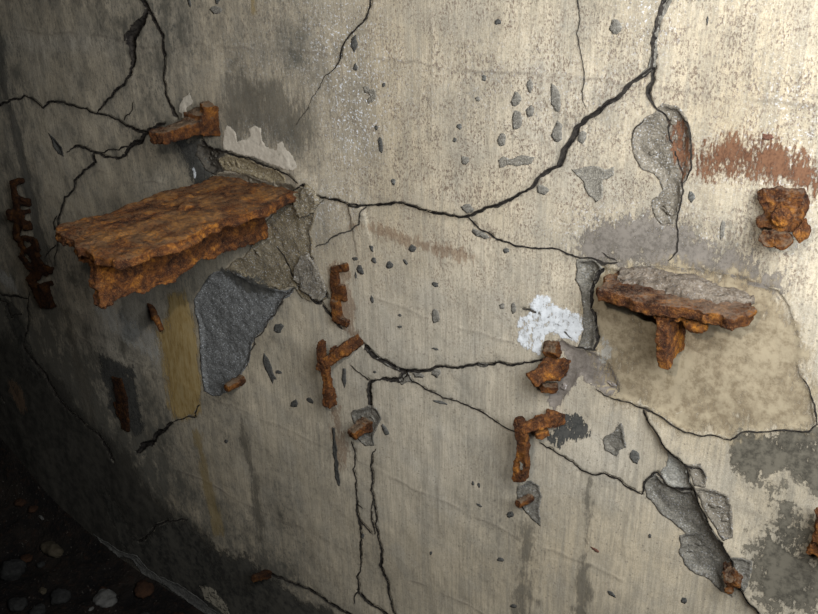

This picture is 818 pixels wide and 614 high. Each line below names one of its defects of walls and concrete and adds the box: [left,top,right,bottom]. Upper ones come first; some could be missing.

rust [6,178,57,309]
peeling [195,125,304,192]
spalling [194,203,329,396]
rust [330,262,350,328]
crack [201,0,692,368]
crack [351,343,546,432]
leakage [517,295,583,355]
spalling [631,103,695,224]
rust [664,120,818,199]
crack [539,378,818,567]
spalling [645,452,753,596]
leakage [729,422,818,614]